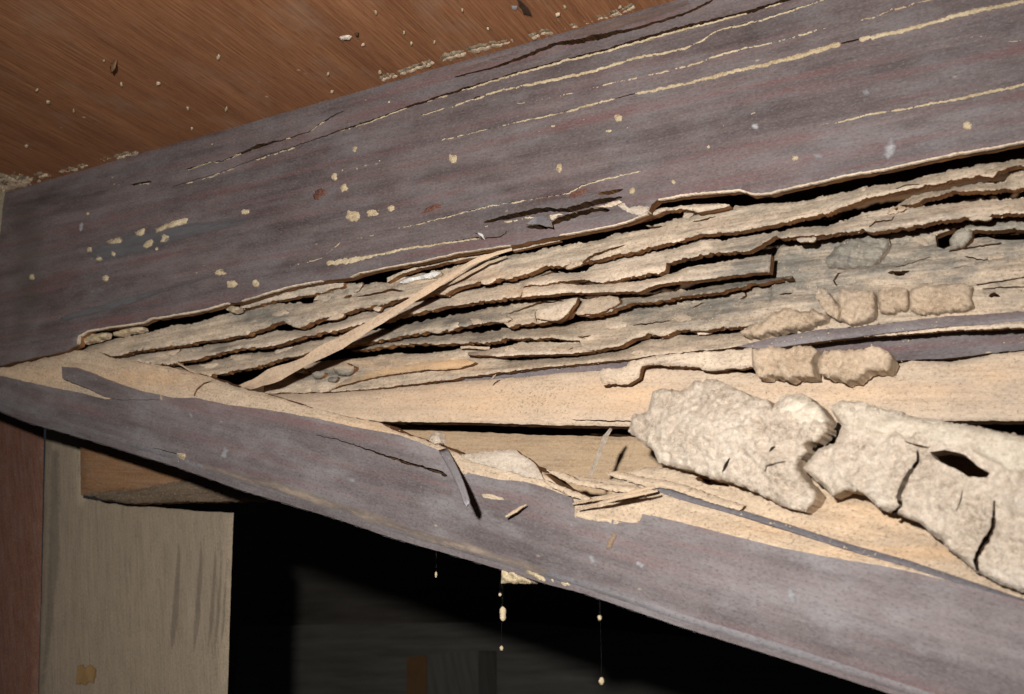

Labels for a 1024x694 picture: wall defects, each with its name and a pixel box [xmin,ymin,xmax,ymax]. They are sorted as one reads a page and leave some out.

crack [179,0,1024,185]
crack [307,171,652,266]
peeling [887,205,907,215]
peeling [344,282,364,296]
peeling [429,315,513,334]
peeling [535,295,627,329]
peeling [201,354,253,369]
peeling [330,359,478,391]
peeling [504,346,573,360]
peeling [598,348,753,387]
crack [317,435,447,477]
peeling [439,448,545,507]